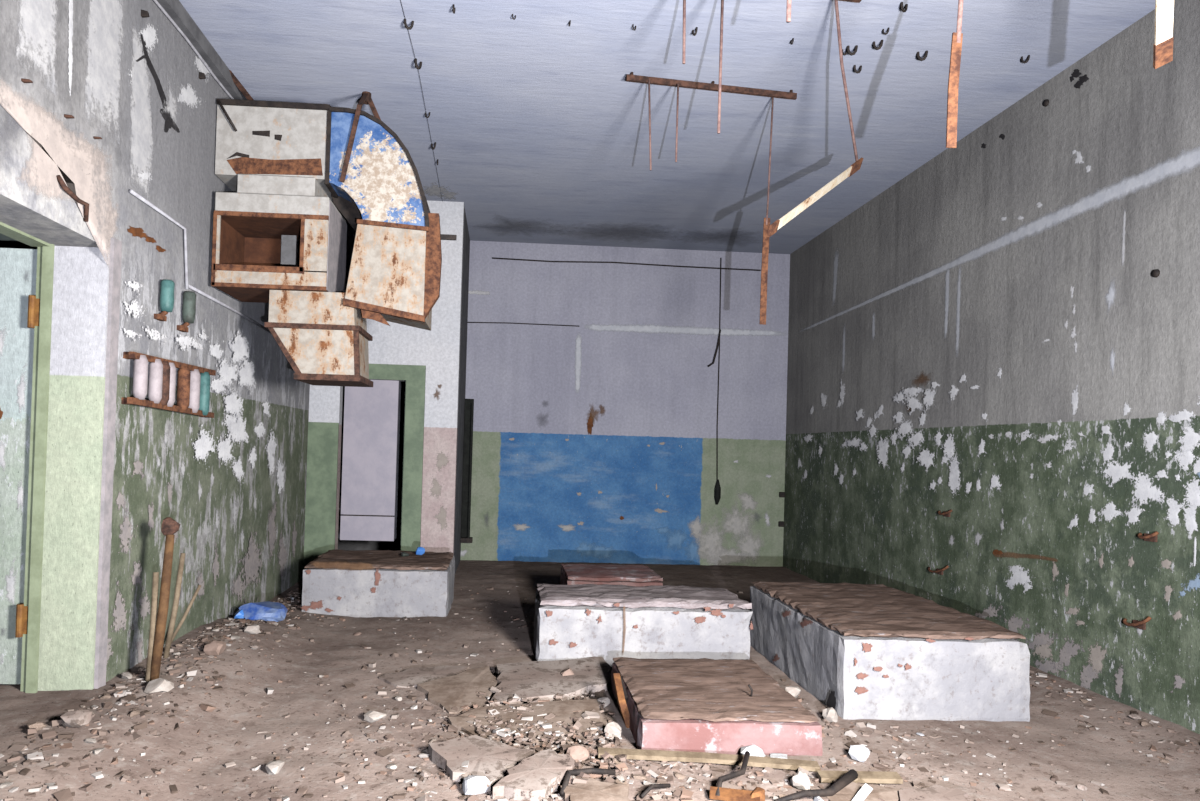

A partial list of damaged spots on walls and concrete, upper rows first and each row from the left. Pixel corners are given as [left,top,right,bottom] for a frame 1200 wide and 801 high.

peeling [18,376,26,409]
peeling [120,278,297,605]
rust [587,406,605,435]
peeling [810,373,1002,497]
peeling [977,384,1084,468]
peeling [1068,396,1200,620]
peeling [6,561,15,603]
peeling [106,491,155,666]
peeling [827,691,836,709]
peeling [854,642,912,694]
peeling [975,562,1125,698]
peeling [1170,674,1185,693]